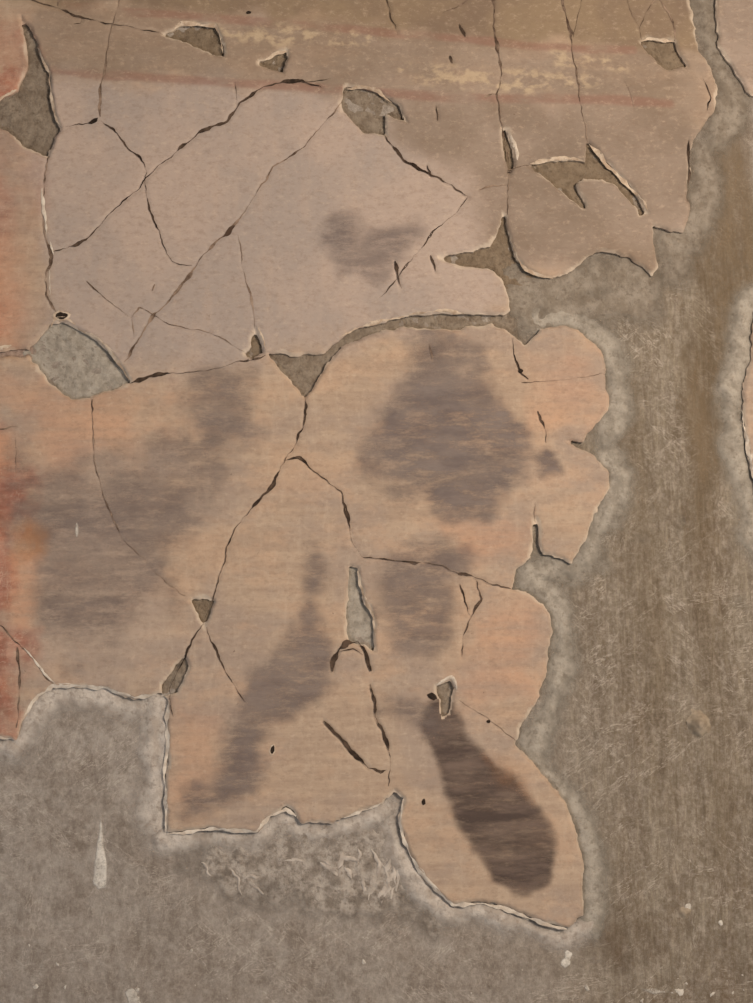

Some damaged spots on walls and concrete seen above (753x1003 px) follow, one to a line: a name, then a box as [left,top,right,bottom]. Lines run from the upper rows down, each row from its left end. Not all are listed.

spalling [0,25,61,156]
crack [33,0,341,384]
spalling [341,85,404,135]
crack [382,0,529,296]
spalling [444,217,553,289]
spalling [530,144,648,216]
spalling [246,309,518,397]
water stain [375,373,527,515]
crack [169,400,511,715]
water stain [187,606,330,810]
crack [324,640,391,786]
water stain [422,700,553,893]